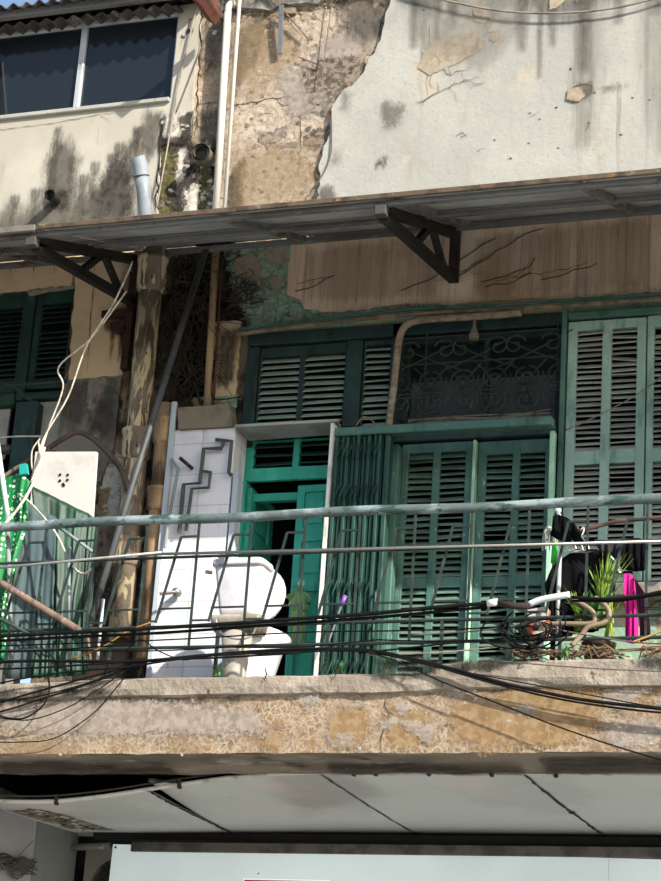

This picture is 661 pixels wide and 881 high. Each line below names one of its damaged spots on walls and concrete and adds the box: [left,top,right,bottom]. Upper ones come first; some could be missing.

peeling [549,0,576,10]
crack [421,25,481,103]
peeling [417,7,500,76]
peeling [157,0,388,214]
damp [0,114,160,227]
damp [195,168,208,208]
peeling [225,245,441,324]
damp [542,757,661,775]
crack [320,774,416,835]
crack [524,775,606,837]